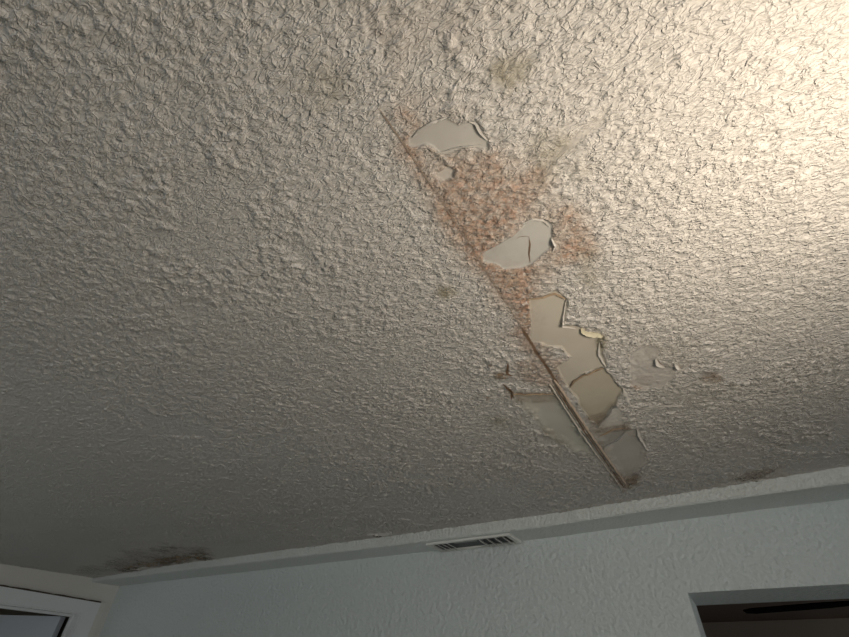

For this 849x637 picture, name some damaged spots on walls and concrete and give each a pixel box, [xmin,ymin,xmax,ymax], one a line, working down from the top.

crack [378,108,627,487]
peeling [483,219,557,269]
peeling [529,291,648,481]